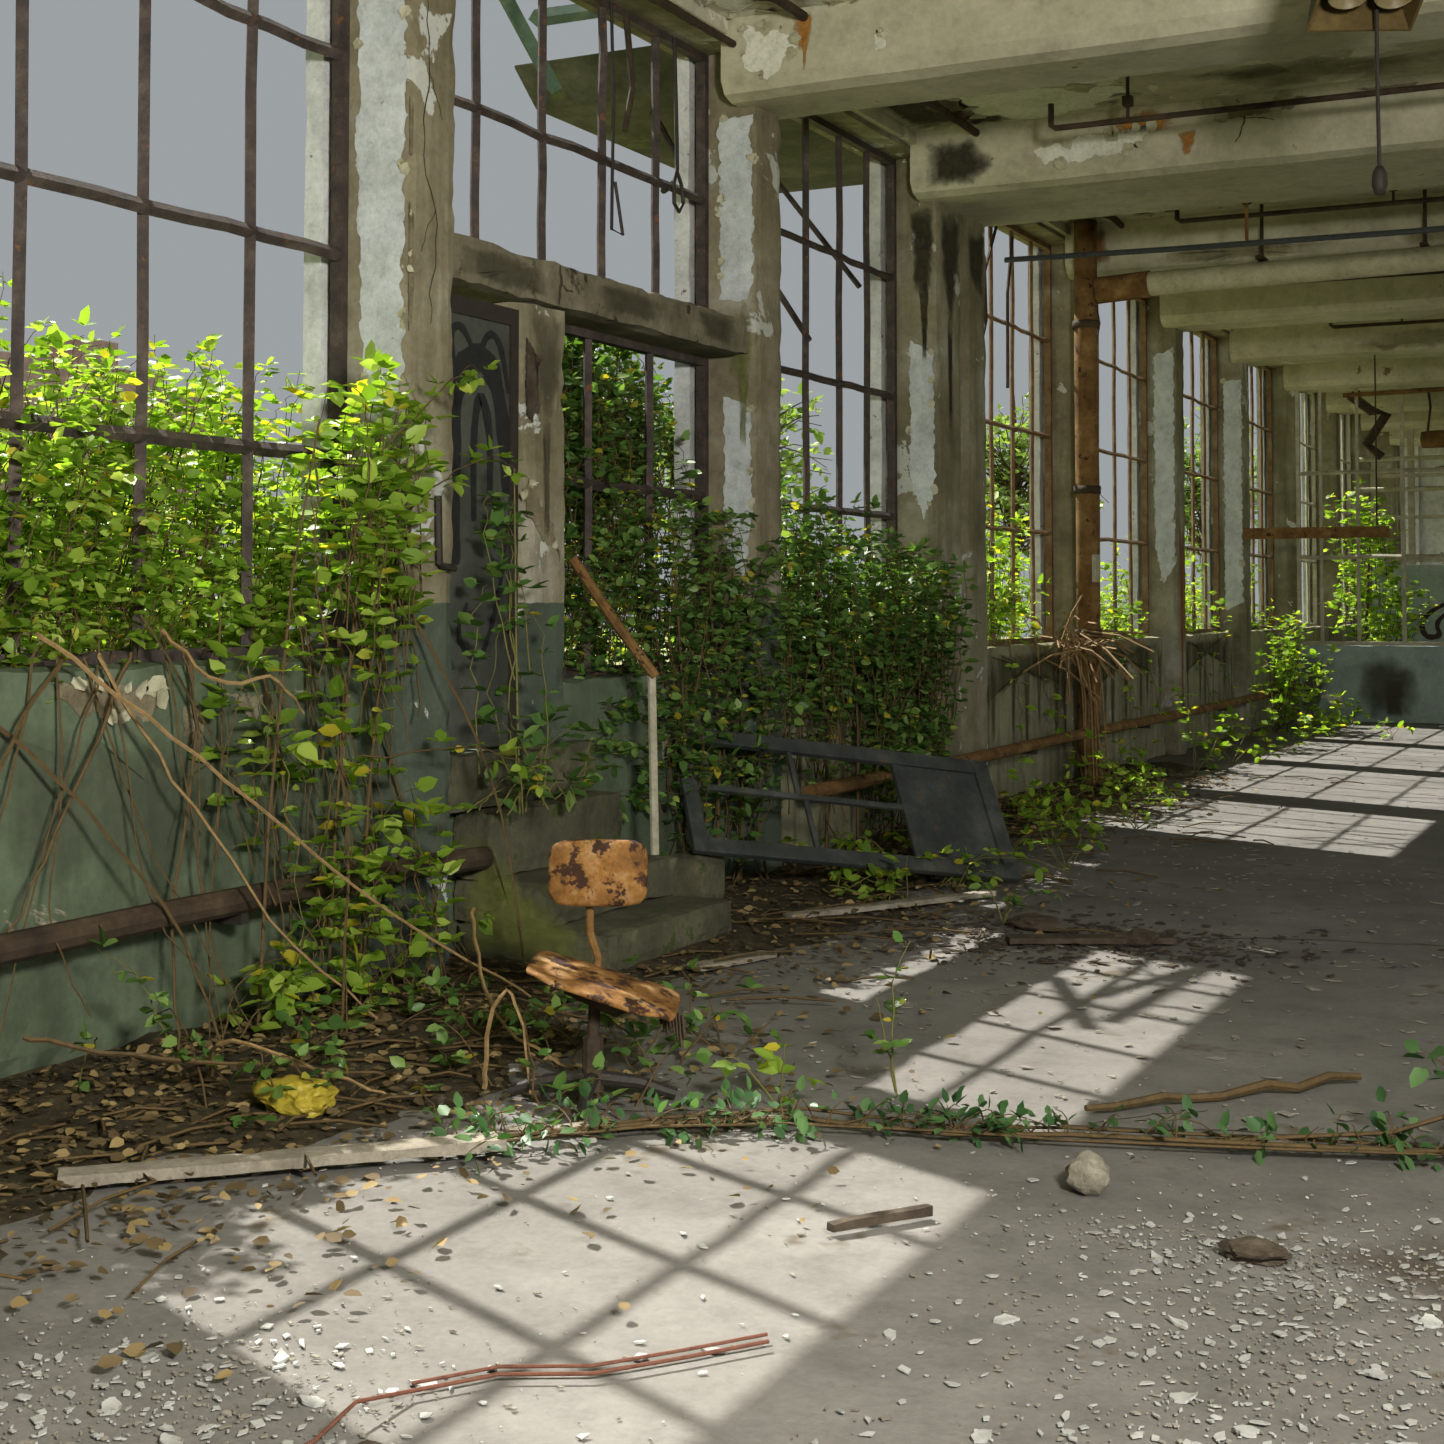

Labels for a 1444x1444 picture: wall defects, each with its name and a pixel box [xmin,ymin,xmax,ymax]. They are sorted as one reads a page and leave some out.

peeling [693,0,801,80]
rust [795,14,811,63]
mould [885,102,1008,128]
mould [932,142,989,183]
peeling [918,84,1157,170]
peeling [714,114,759,307]
leakage [911,214,983,413]
peeling [905,340,938,519]
peeling [721,397,756,576]
peeling [51,675,205,752]
peeling [230,693,263,723]